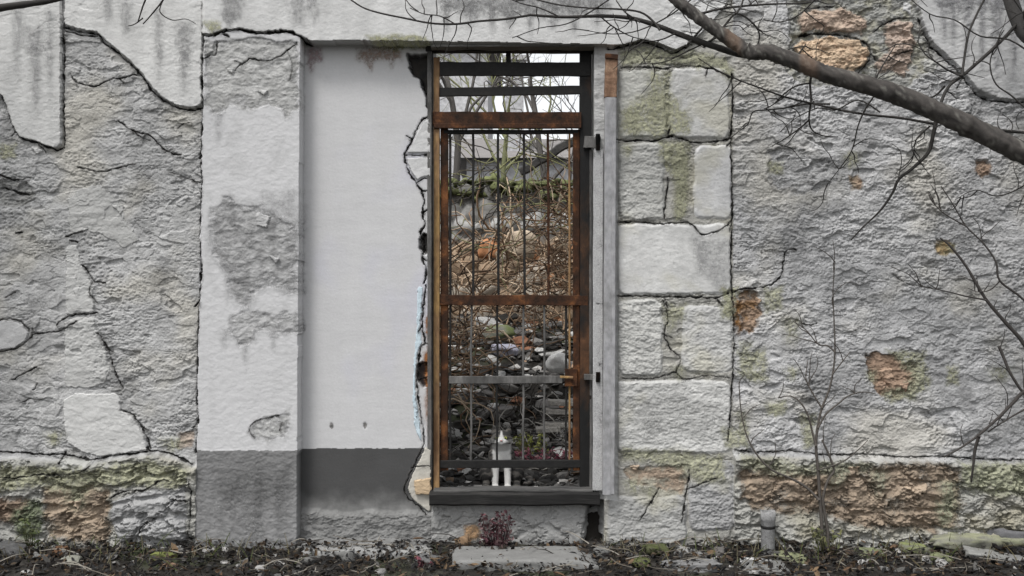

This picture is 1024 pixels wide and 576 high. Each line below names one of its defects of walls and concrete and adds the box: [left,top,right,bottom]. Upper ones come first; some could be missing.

spalling [408,55,427,96]
flaking render [784,0,1024,100]
crack [0,25,313,331]
flaking render [407,116,432,180]
crack [607,40,1022,462]
spalling [736,290,762,332]
crack [0,231,200,539]
flaking render [408,287,432,511]
spalling [865,351,916,399]
spalling [42,485,111,543]
crack [682,469,717,515]
spalling [739,463,961,534]